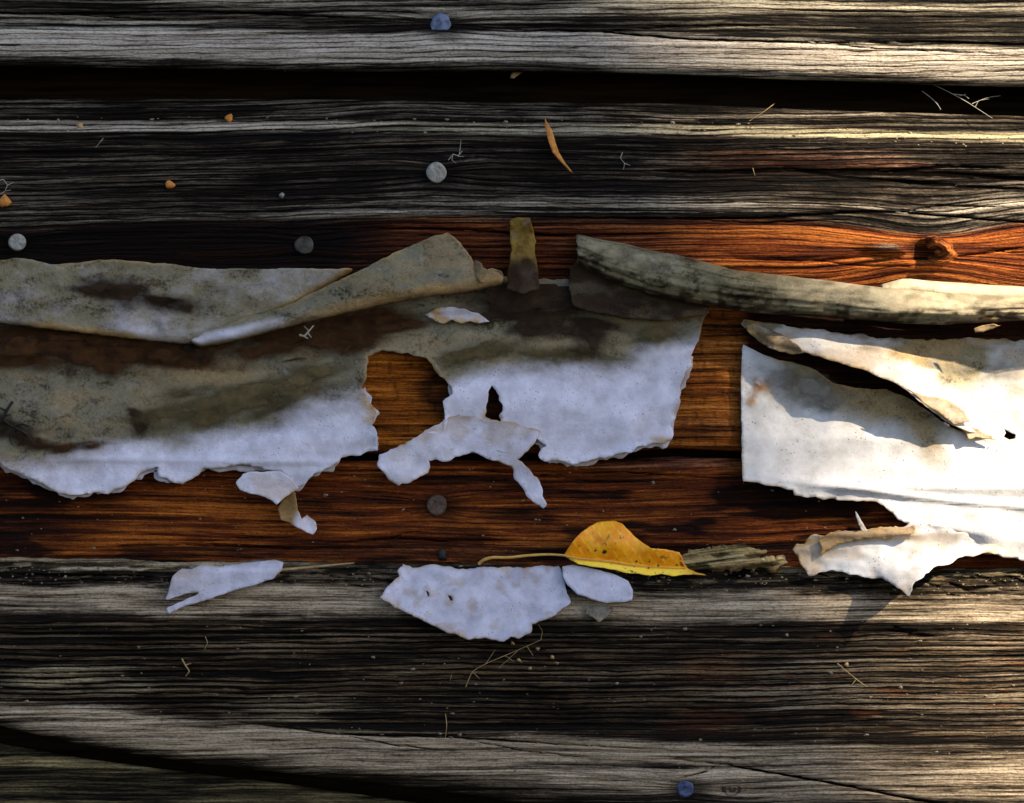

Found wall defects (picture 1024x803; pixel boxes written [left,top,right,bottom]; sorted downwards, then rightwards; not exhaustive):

water stain [70,280,196,312]
water stain [0,306,429,435]
water stain [0,415,105,453]